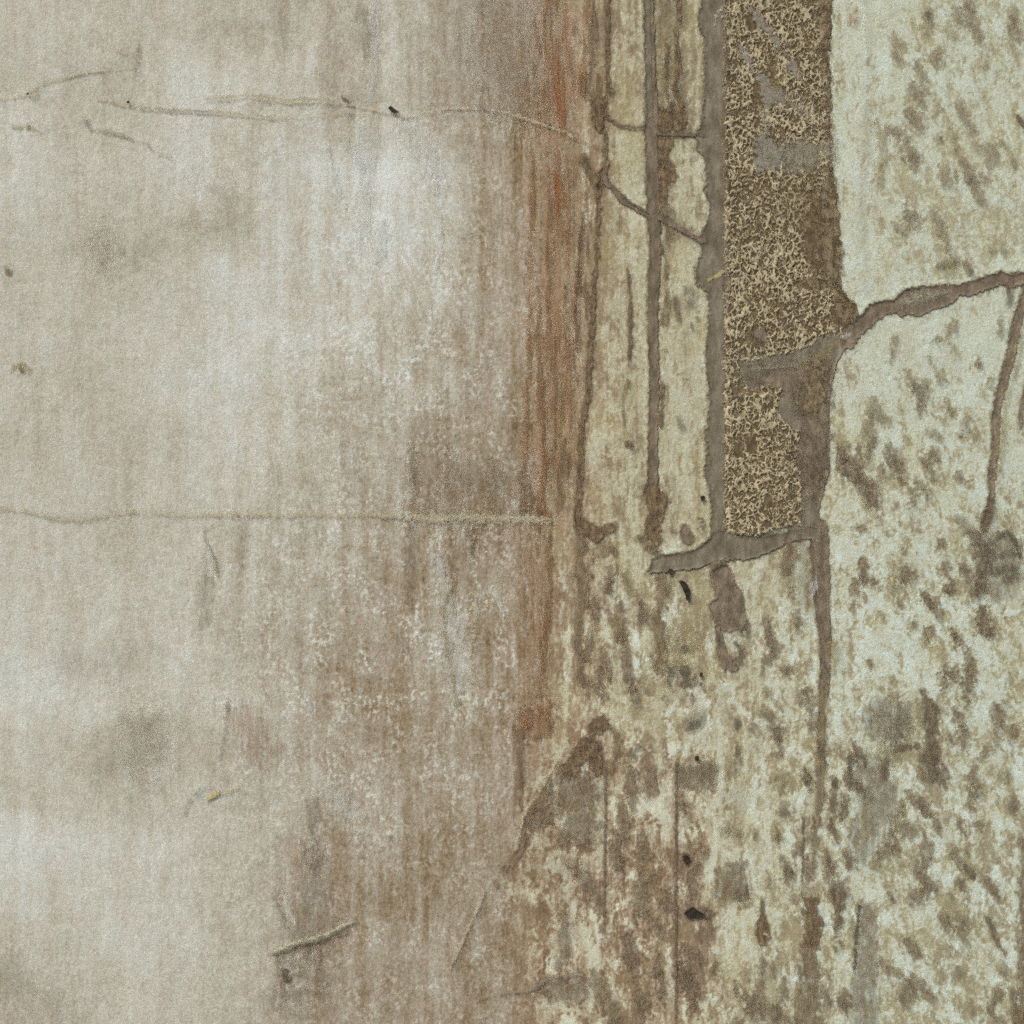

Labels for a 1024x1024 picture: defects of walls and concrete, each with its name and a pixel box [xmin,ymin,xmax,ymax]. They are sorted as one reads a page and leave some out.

corrosion [555,0,602,117]
spalling [721,0,938,539]
corrosion [519,192,591,666]
crack [341,0,832,894]
crack [842,259,1024,531]
damp [651,572,670,674]
damp [966,529,1022,634]
damp [879,742,920,780]
damp [792,895,825,1024]
damp [853,905,861,969]
damp [1009,837,1024,1024]